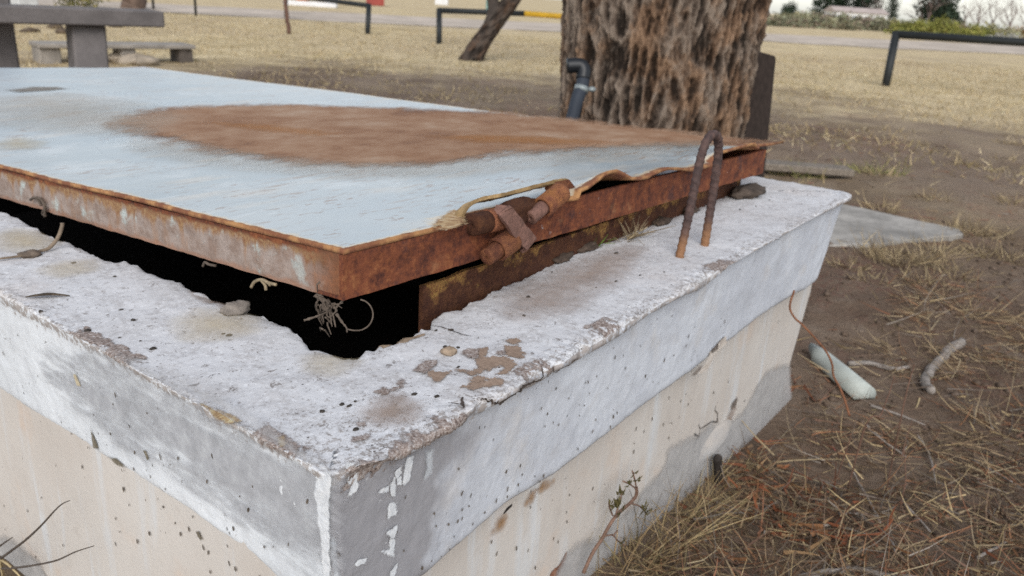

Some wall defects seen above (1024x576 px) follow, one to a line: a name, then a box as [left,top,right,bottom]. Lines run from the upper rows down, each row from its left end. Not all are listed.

rust [106,103,767,167]
rust [433,210,468,229]
peeling [412,338,554,390]
peeling [48,326,468,576]